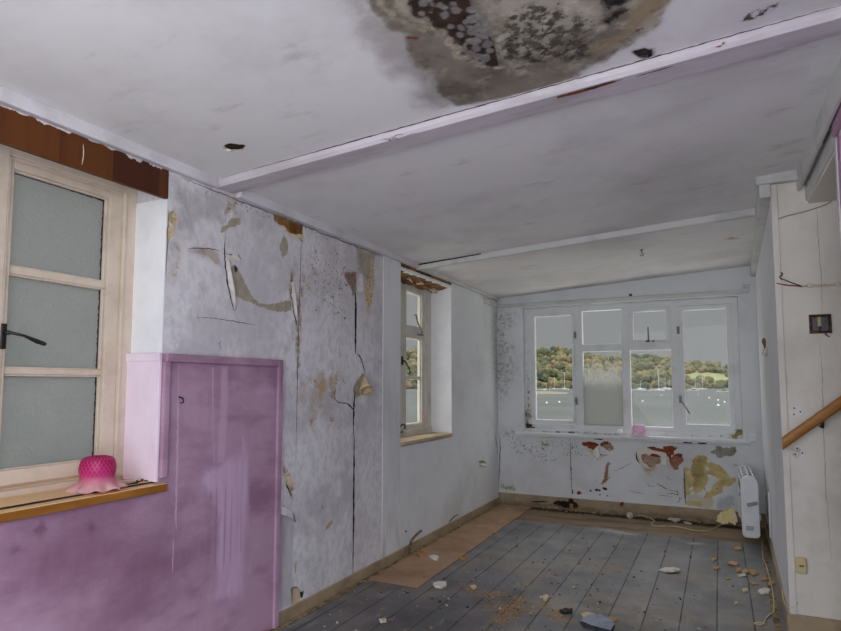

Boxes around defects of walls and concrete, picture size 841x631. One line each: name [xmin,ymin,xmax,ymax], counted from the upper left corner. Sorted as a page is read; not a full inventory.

leakage [334,0,676,117]
peeling [0,104,71,134]
peeling [273,215,304,257]
peeling [224,237,292,313]
leakage [503,375,595,461]
spalling [576,438,614,497]
flaking render [635,442,749,509]